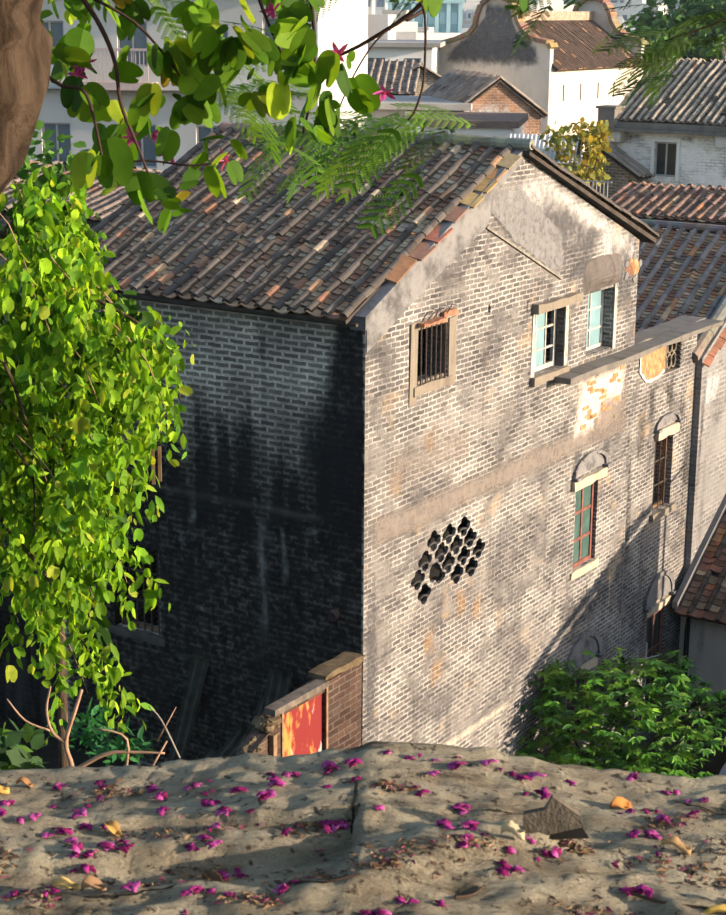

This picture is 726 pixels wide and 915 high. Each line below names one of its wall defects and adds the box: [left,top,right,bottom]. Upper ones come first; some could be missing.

spalling [639,346,667,383]
peeling [575,365,625,436]
damp [375,393,627,544]
damp [69,325,377,763]
damp [566,584,600,629]